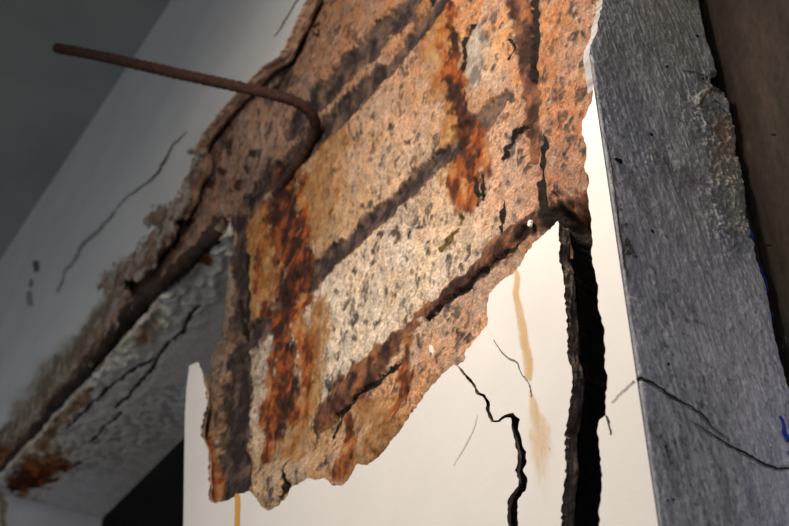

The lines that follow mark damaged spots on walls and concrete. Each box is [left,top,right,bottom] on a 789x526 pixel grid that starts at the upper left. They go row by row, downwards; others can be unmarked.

crack [57,131,187,292]
spalling [0,0,599,511]
crack [65,305,201,443]
crack [461,369,528,526]
crack [494,340,532,397]
crack [569,232,789,526]